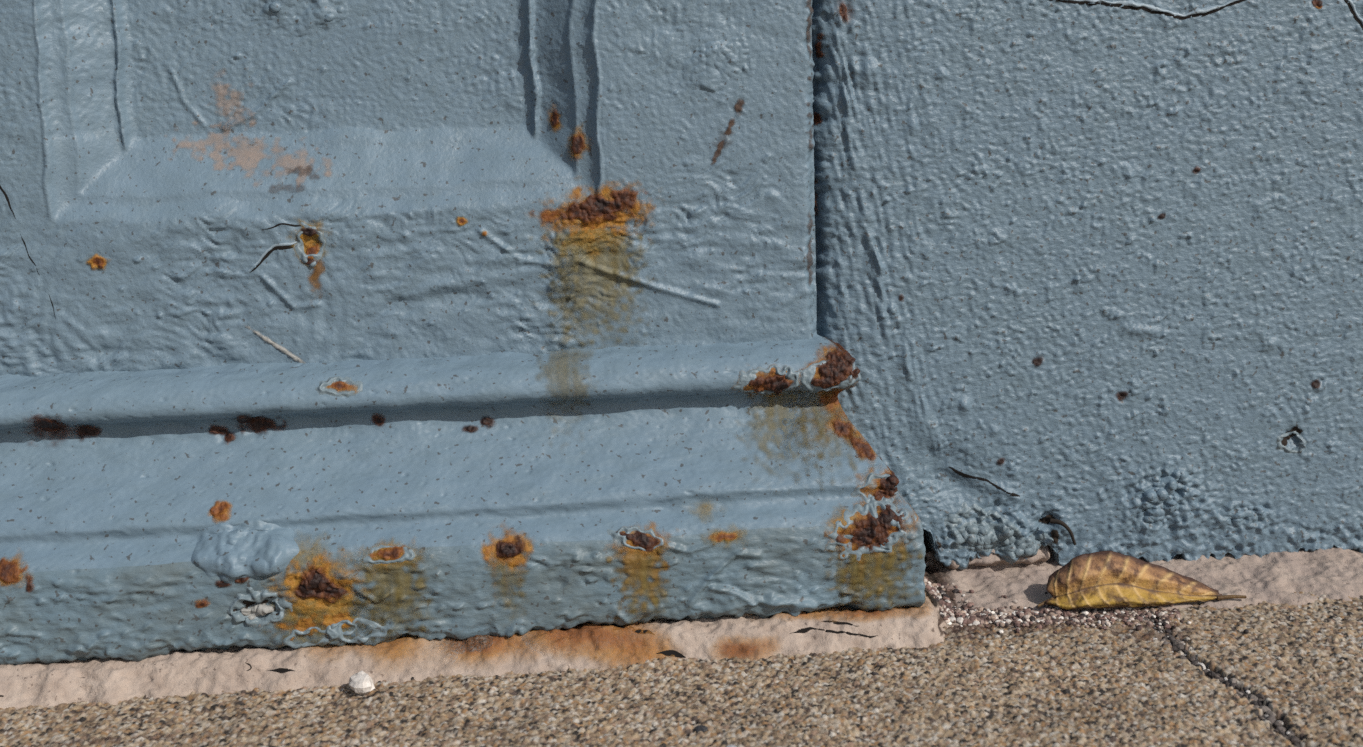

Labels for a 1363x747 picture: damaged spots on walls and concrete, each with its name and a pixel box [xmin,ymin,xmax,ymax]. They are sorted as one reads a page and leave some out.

crack [1050,0,1245,20]
crack [1344,0,1363,29]
corrosion [293,220,326,288]
corrosion [541,186,651,345]
corrosion [33,416,101,437]
corrosion [210,416,286,442]
corrosion [731,343,922,619]
corrosion [216,577,249,587]
corrosion [270,543,430,658]
corrosion [442,525,677,664]